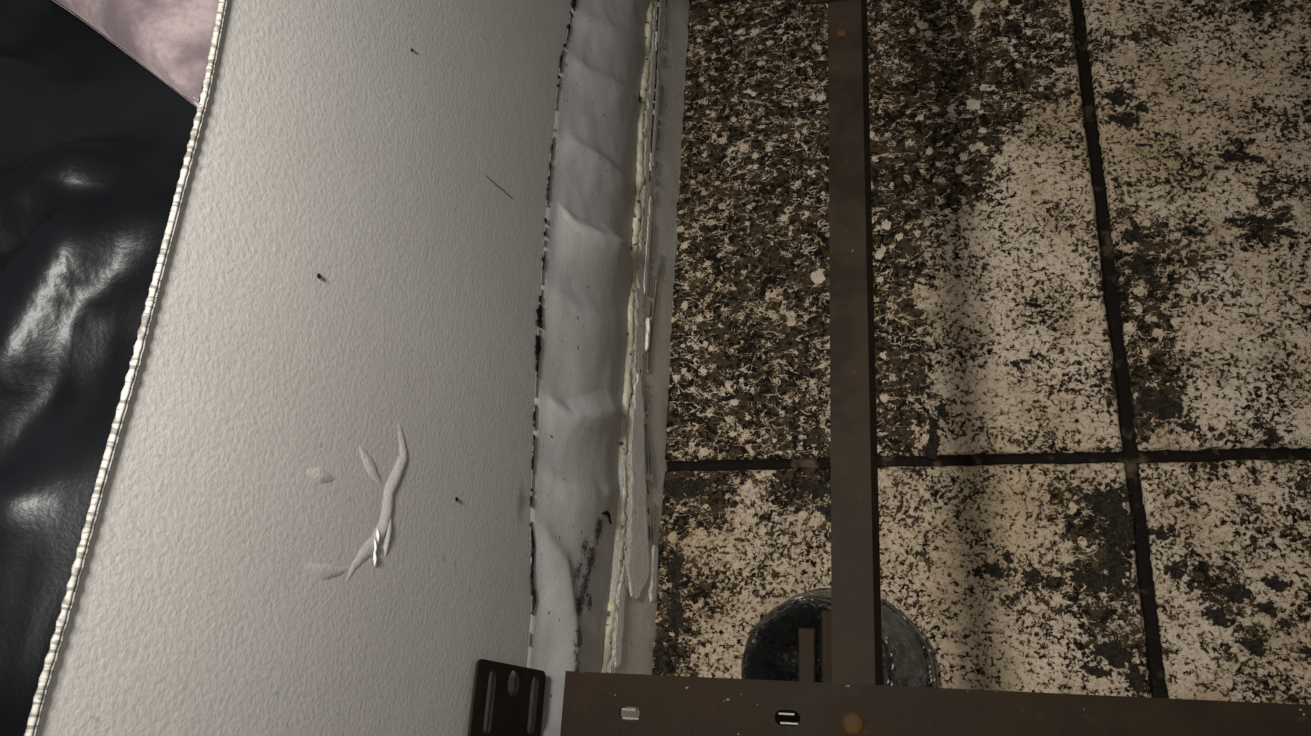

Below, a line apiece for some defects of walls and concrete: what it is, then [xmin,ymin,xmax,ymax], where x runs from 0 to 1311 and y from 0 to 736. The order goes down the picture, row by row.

damp [1103,88,1147,132]
damp [1224,215,1300,237]
crack [528,0,576,645]
damp [1009,354,1039,370]
damp [921,401,949,460]
damp [1135,385,1201,433]
damp [1070,470,1176,598]
damp [573,511,612,671]
damp [653,540,690,675]
damp [972,550,1049,584]
damp [1203,574,1294,659]
damp [1079,638,1145,697]